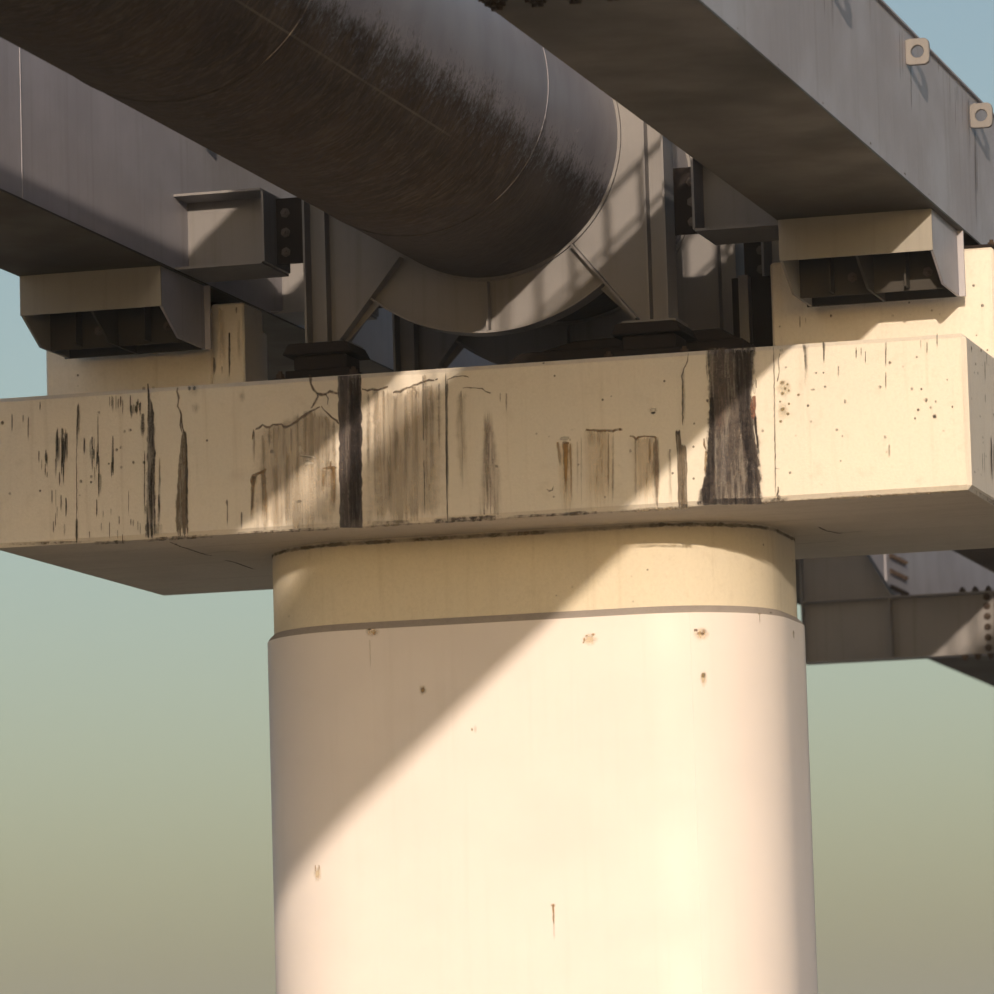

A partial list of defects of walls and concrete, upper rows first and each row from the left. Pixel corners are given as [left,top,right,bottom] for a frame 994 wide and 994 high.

water stain [38,404,121,544]
water stain [100,384,196,544]
corrosion [250,469,267,511]
crack [252,375,339,439]
corrosion [322,462,336,496]
water stain [337,375,429,528]
crack [362,375,490,520]
corrosion [557,437,572,491]
corrosion [586,428,658,497]
water stain [634,347,784,512]
water stain [412,530,548,541]
water stain [628,522,795,540]